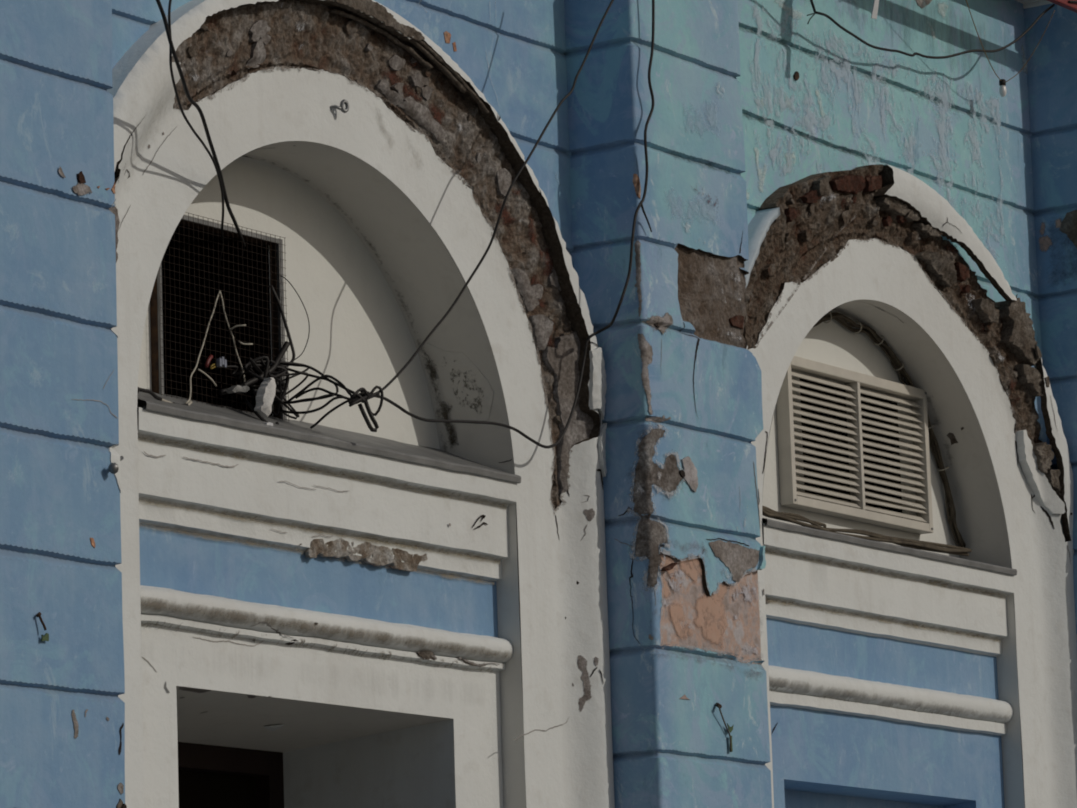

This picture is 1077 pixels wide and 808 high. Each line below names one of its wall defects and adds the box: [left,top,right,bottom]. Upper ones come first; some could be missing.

flaking render [59,164,130,262]
spalling [172,0,607,514]
spalling [634,240,642,320]
flaking render [1039,210,1077,251]
spalling [674,164,1065,514]
flaking render [627,334,770,665]
flaking render [300,538,428,572]
peeling [572,655,604,712]